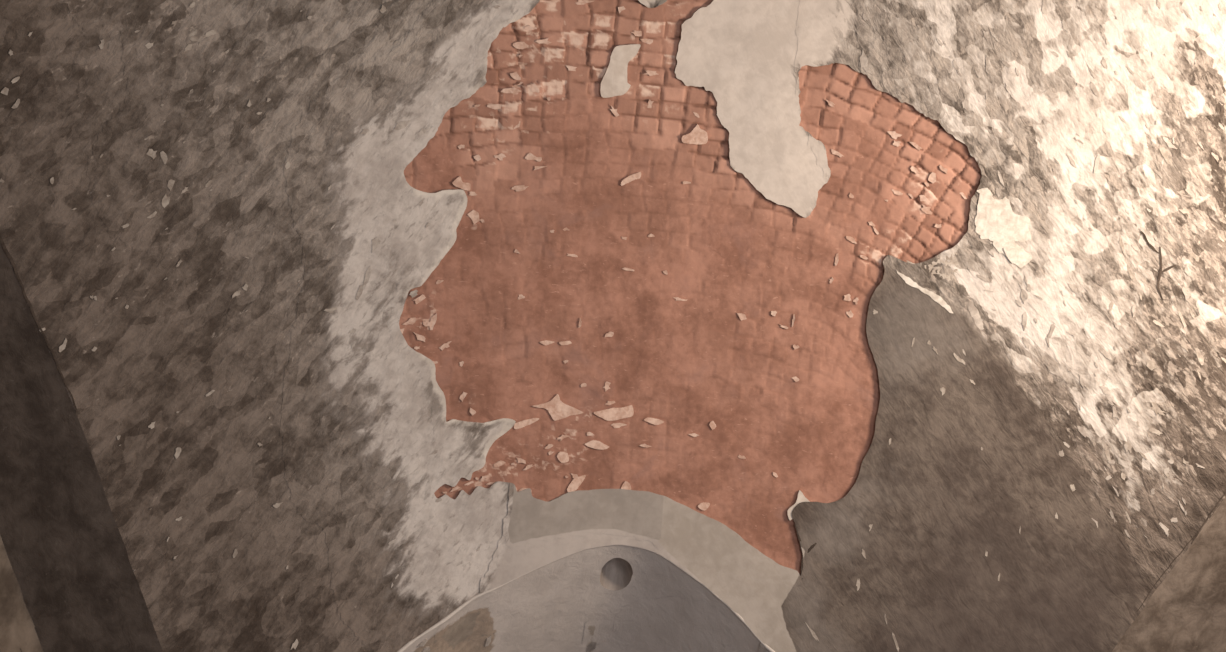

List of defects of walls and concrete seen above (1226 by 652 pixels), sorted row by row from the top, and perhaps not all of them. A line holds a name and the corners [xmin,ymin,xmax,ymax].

peeling [0,76,20,109]
peeling [64,0,250,280]
spalling [269,0,1032,652]
water stain [785,0,1226,652]